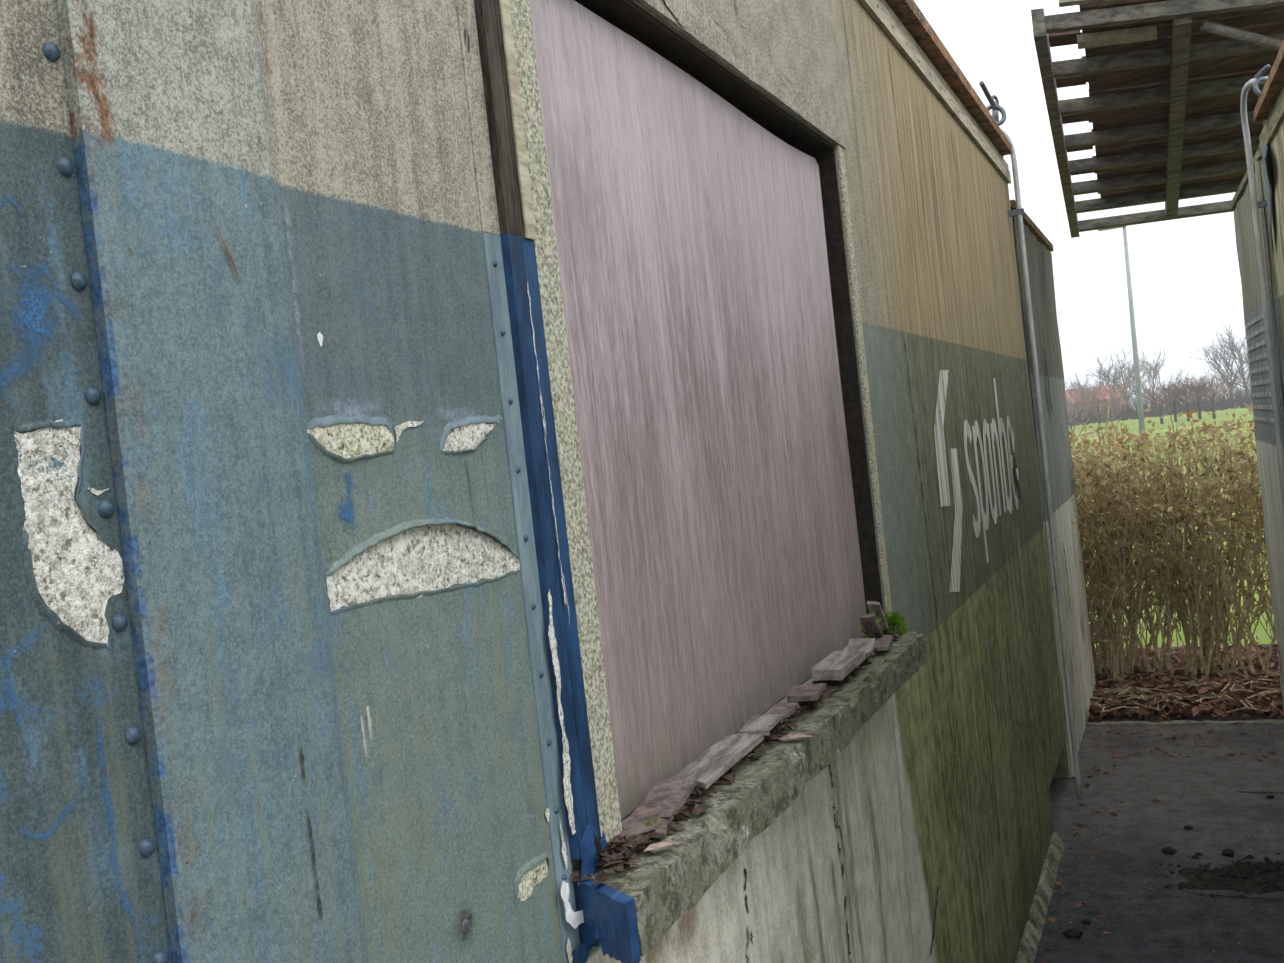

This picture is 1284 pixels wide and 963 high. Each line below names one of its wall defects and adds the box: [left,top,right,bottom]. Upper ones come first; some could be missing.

peeling [307,402,423,464]
peeling [440,408,503,456]
peeling [13,418,125,649]
peeling [326,517,520,615]
peeling [514,589,627,963]
crack [829,763,852,963]